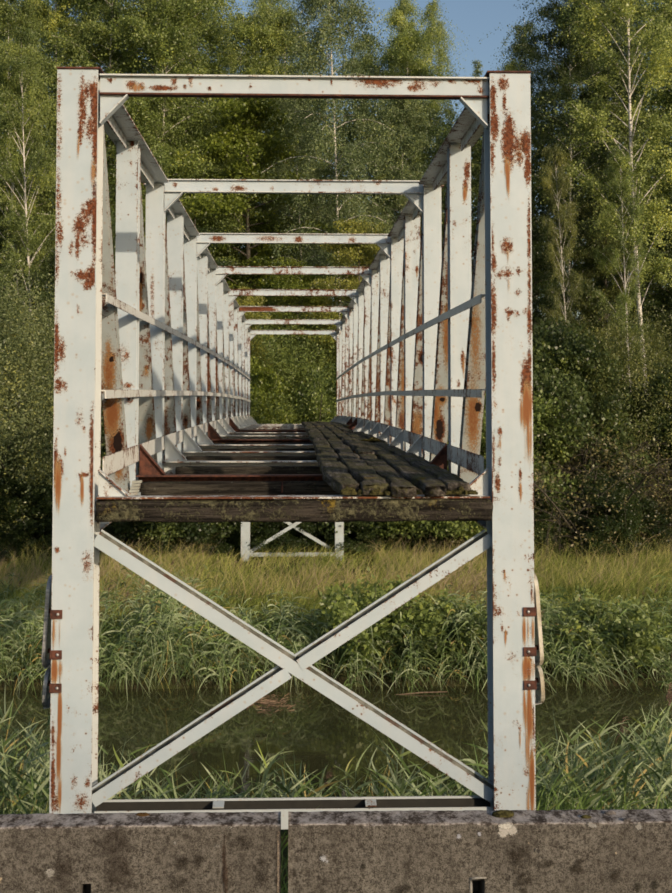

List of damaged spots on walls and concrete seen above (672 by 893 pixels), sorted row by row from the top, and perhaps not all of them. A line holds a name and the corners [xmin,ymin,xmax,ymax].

rust [56,71,112,290]
rust [126,77,193,92]
rust [353,74,531,201]
rust [54,438,66,509]
rust [54,309,68,394]
rust [75,342,142,522]
rust [369,346,422,435]
rust [433,387,447,441]
rust [457,305,482,453]
rust [492,198,532,456]
rust [51,660,90,814]
rust [501,626,535,810]